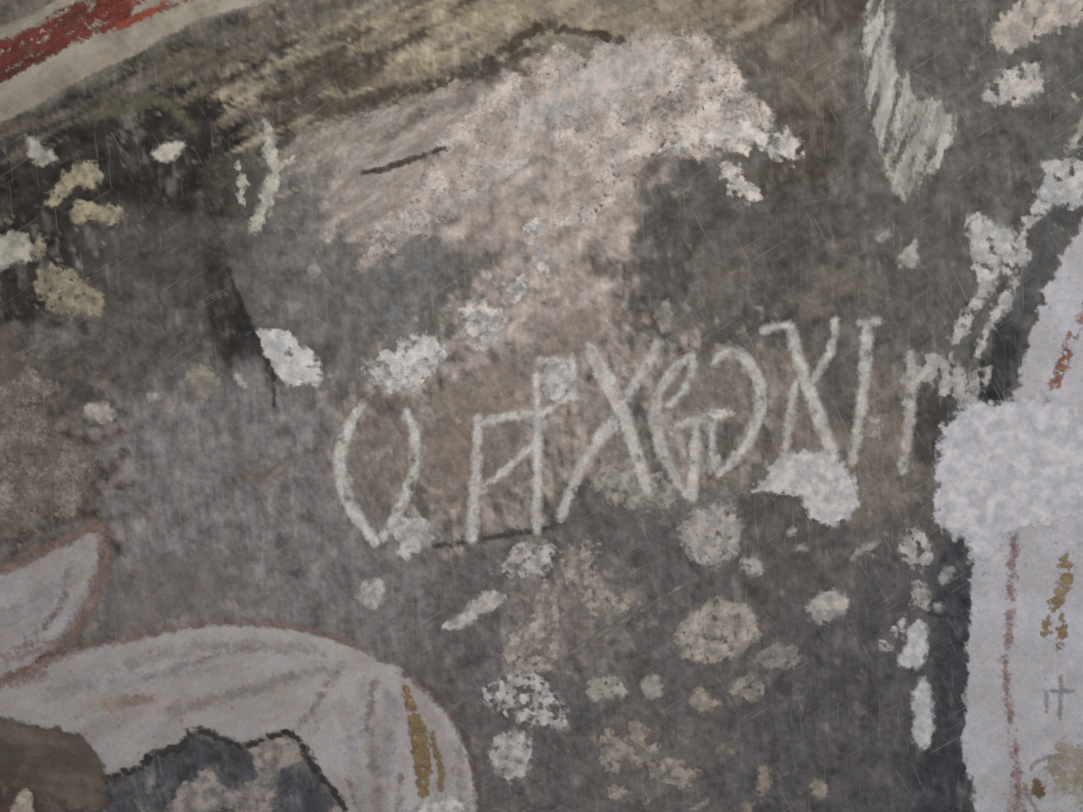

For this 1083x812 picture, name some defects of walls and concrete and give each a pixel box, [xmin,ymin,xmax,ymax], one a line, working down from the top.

peeling [989,0,1083,54]
peeling [982,61,1044,107]
spalling [26,136,123,225]
spalling [151,141,185,163]
water stain [201,82,482,252]
spalling [0,218,105,320]
peeling [256,328,323,387]
peeling [751,449,860,527]
spalling [676,498,764,577]
spalling [442,590,507,630]
spalling [481,538,635,784]
spalling [673,595,802,715]